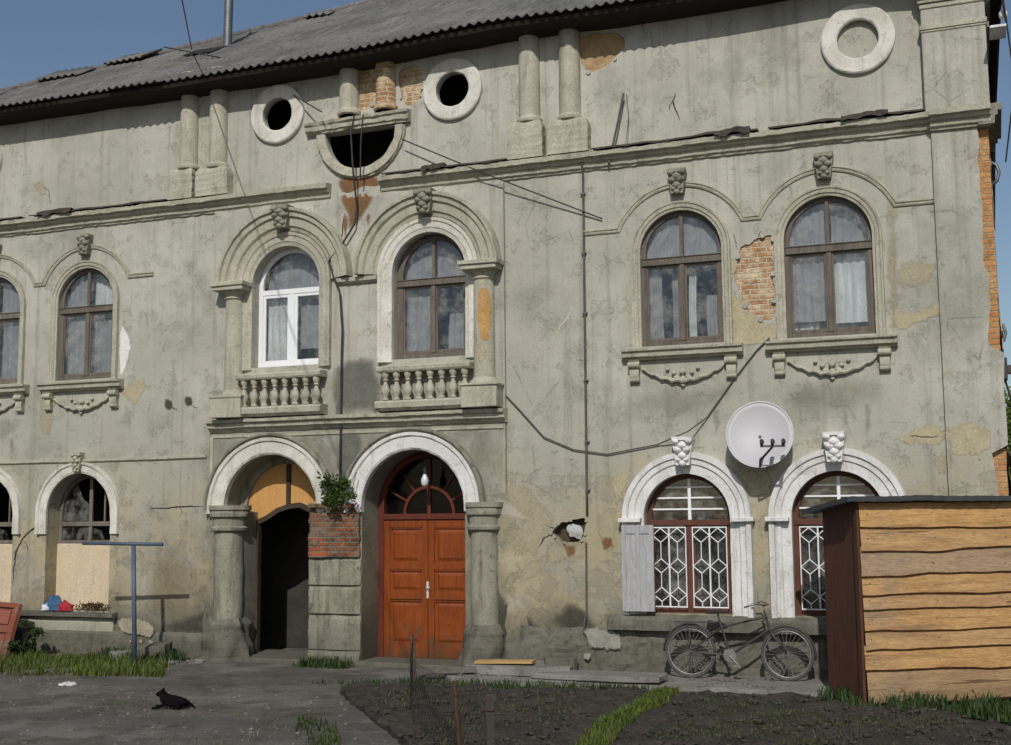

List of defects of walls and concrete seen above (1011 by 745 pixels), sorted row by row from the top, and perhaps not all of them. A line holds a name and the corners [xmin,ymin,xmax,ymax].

spalling [359,69,376,111]
spalling [399,65,424,106]
spalling [579,32,626,75]
spalling [978,128,1004,352]
spalling [477,288,492,363]
spalling [731,231,777,345]
peeling [896,421,1011,496]
spalling [538,508,616,564]